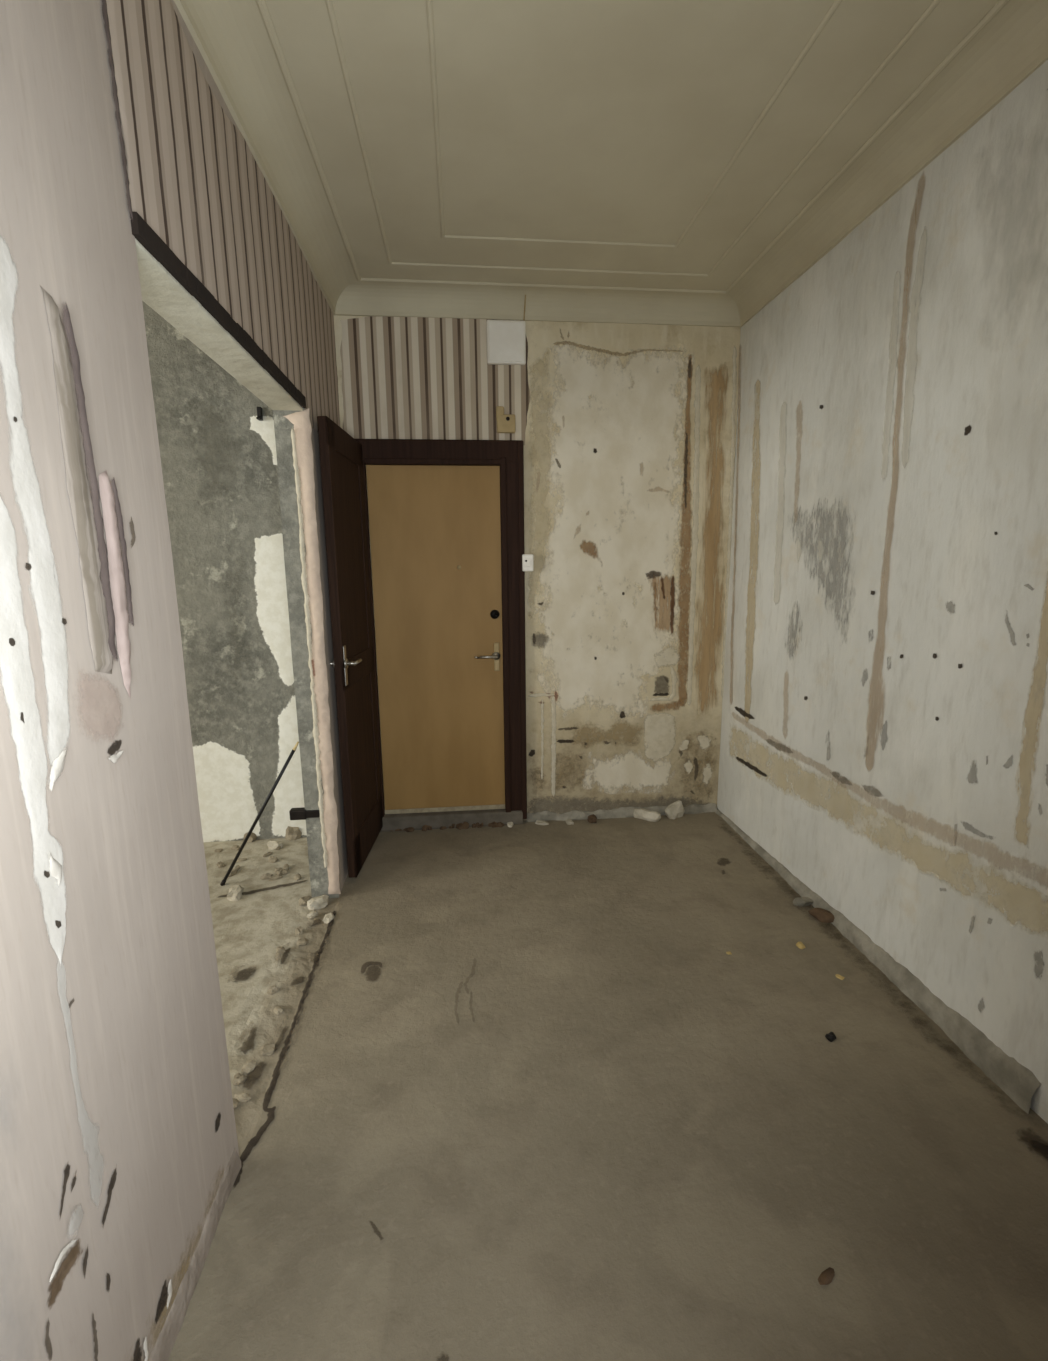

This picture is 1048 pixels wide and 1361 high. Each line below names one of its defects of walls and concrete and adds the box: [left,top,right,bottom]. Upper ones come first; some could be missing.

flaking render [193,409,341,894]
peeling [644,647,713,799]
spalling [107,740,123,763]
peeling [766,739,792,753]
flaking render [968,756,988,783]
peeling [832,772,881,797]
flaking render [954,822,992,846]
flaking render [45,1239,88,1360]
flaking render [155,1279,173,1324]
flaking render [133,1337,149,1361]